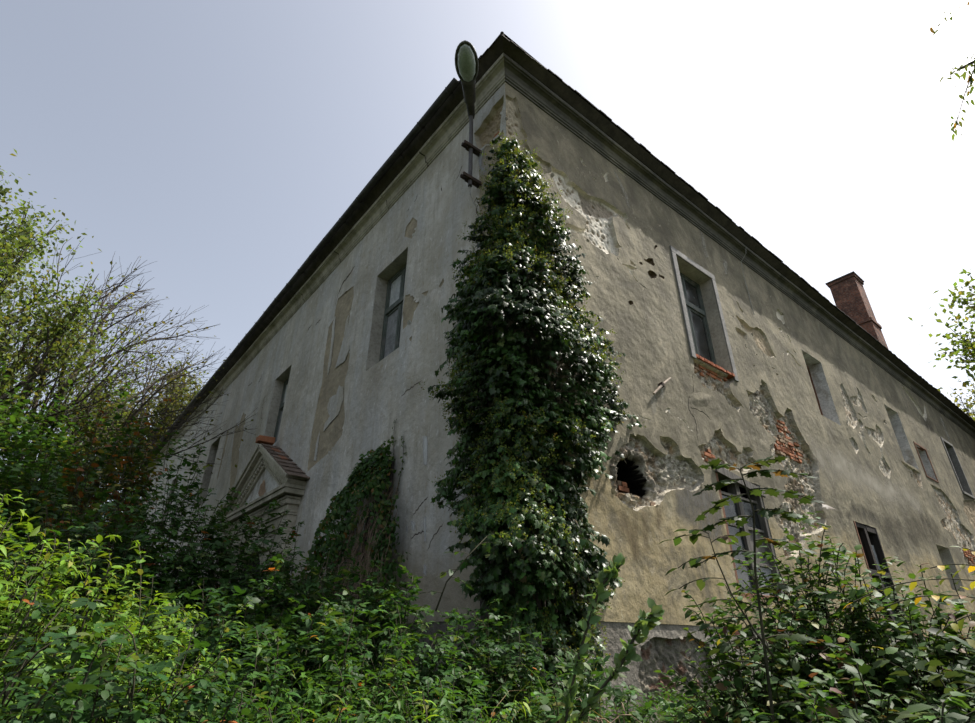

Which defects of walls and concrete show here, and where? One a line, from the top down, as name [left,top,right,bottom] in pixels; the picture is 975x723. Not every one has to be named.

flaking render [474,94,664,282]
flaking render [733,302,801,376]
spalling [610,428,755,511]
flaking render [693,359,827,558]
flaking render [840,383,891,479]
flaking render [900,460,975,573]